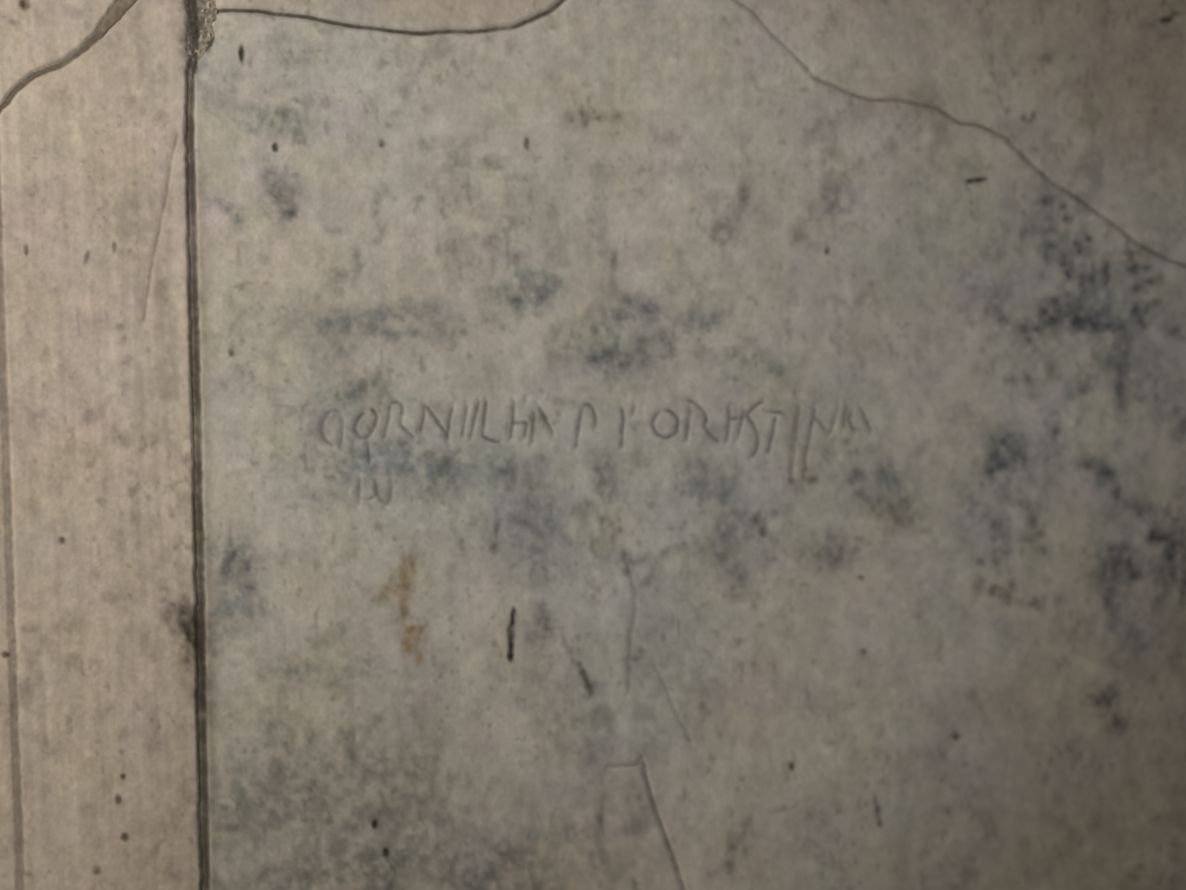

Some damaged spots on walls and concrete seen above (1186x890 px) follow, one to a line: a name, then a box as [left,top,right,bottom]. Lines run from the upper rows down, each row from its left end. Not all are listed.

crack [0,0,136,111]
crack [218,0,564,36]